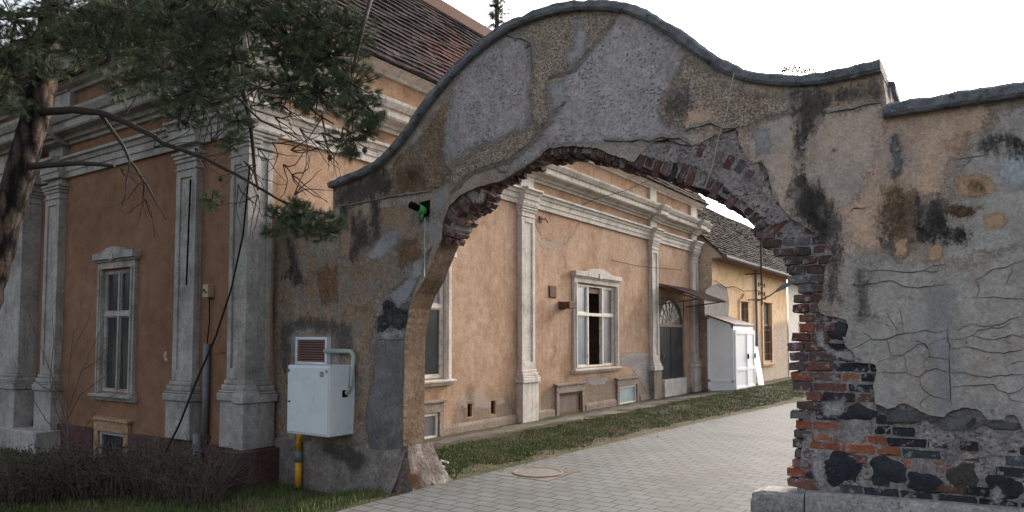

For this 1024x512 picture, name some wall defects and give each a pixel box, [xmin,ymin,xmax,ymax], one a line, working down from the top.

flaking render [274,11,1024,450]
crack [604,119,739,152]
water stain [786,76,882,303]
water stain [913,193,966,246]
water stain [978,134,1024,188]
crack [850,259,1024,408]